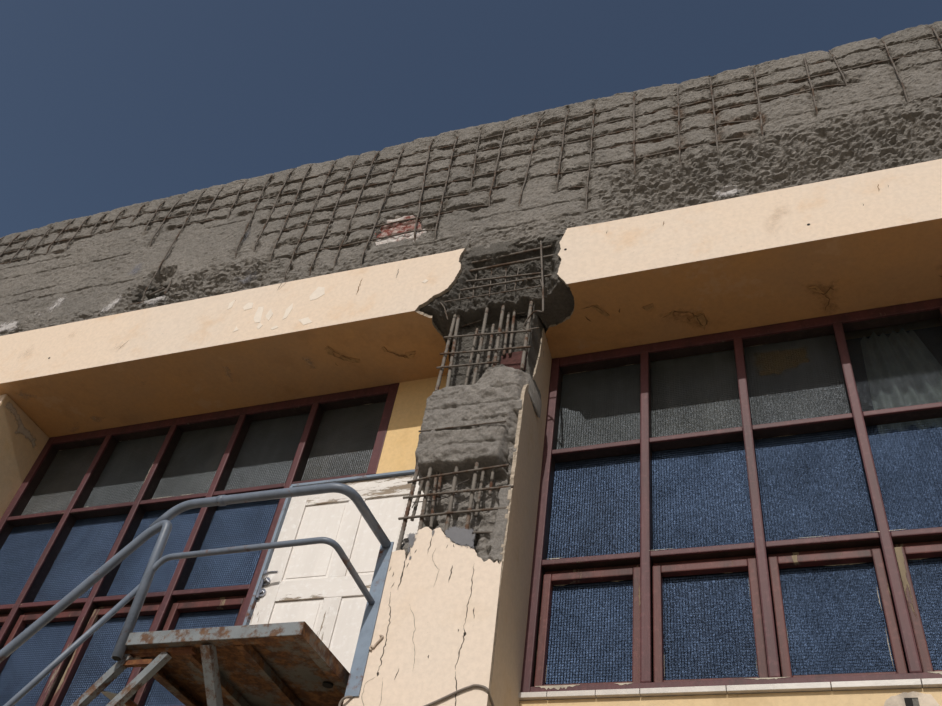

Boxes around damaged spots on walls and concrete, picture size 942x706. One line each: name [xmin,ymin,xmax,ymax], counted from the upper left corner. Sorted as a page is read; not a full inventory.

spalling [0,21,942,563]
crack [361,592,416,706]
crack [455,566,474,706]